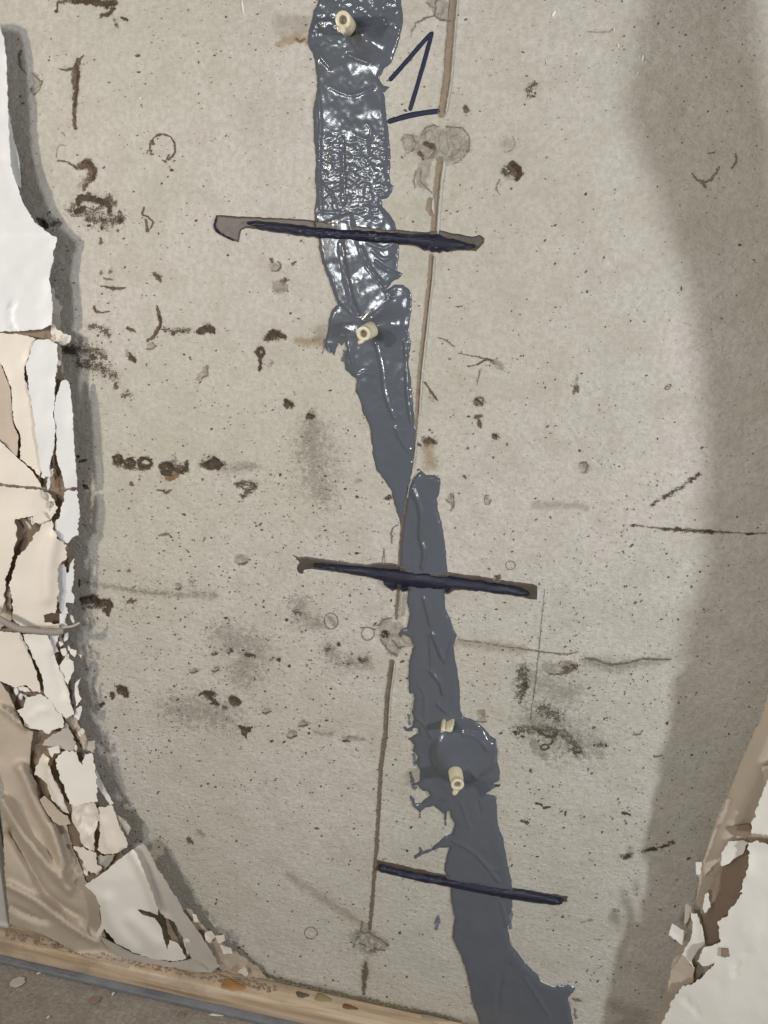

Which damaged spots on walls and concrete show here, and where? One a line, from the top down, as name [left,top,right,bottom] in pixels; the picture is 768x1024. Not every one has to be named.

peeling [195,365,209,381]
crack [438,337,504,386]
crack [631,524,766,535]
crack [458,589,672,720]